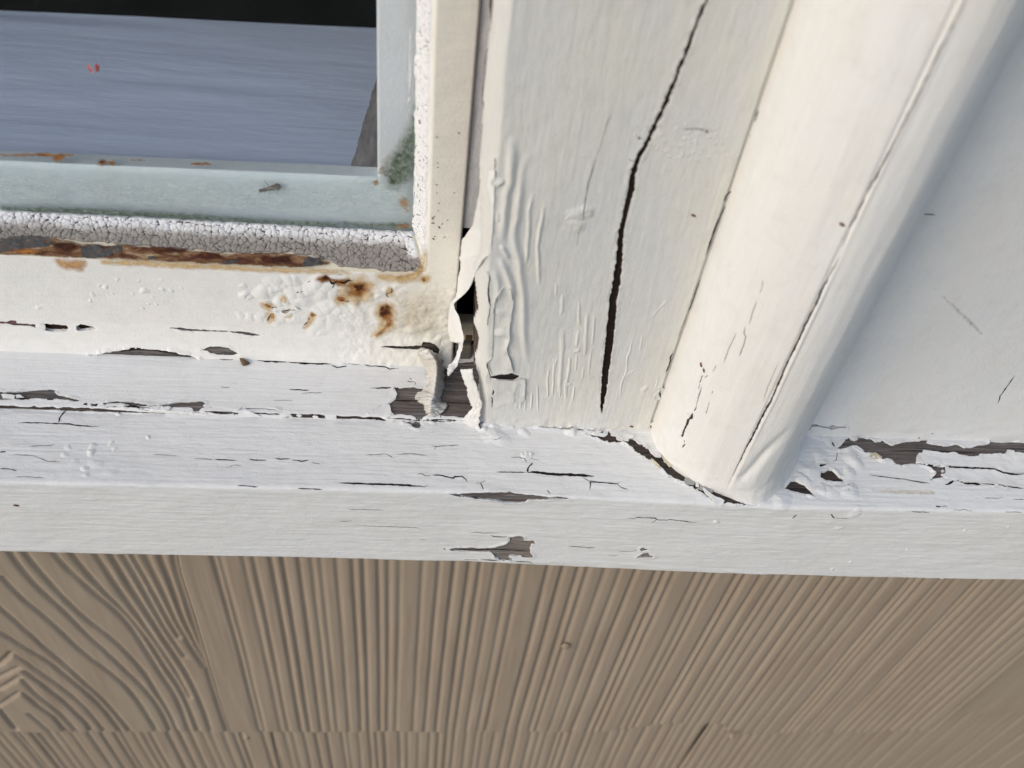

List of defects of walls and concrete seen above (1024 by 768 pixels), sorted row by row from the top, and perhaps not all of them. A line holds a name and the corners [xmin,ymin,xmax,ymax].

crack [0,5,430,298]
crack [479,0,714,437]
crack [706,191,731,254]
rust [0,235,429,321]
rust [375,304,394,336]
peeling [366,170,525,432]
peeling [0,388,318,419]
crack [154,445,628,540]
peeling [778,435,1024,499]
peeling [445,534,537,564]